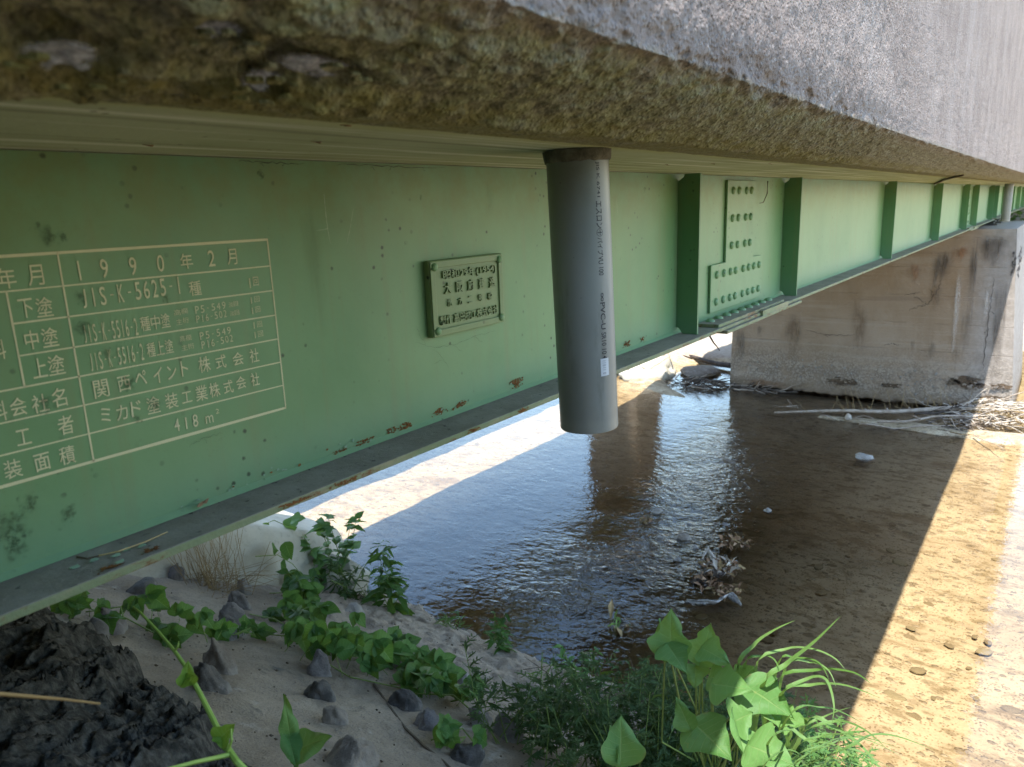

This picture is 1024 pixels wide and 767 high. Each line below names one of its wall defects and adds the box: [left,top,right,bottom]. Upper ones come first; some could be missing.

crack [983,280,995,368]